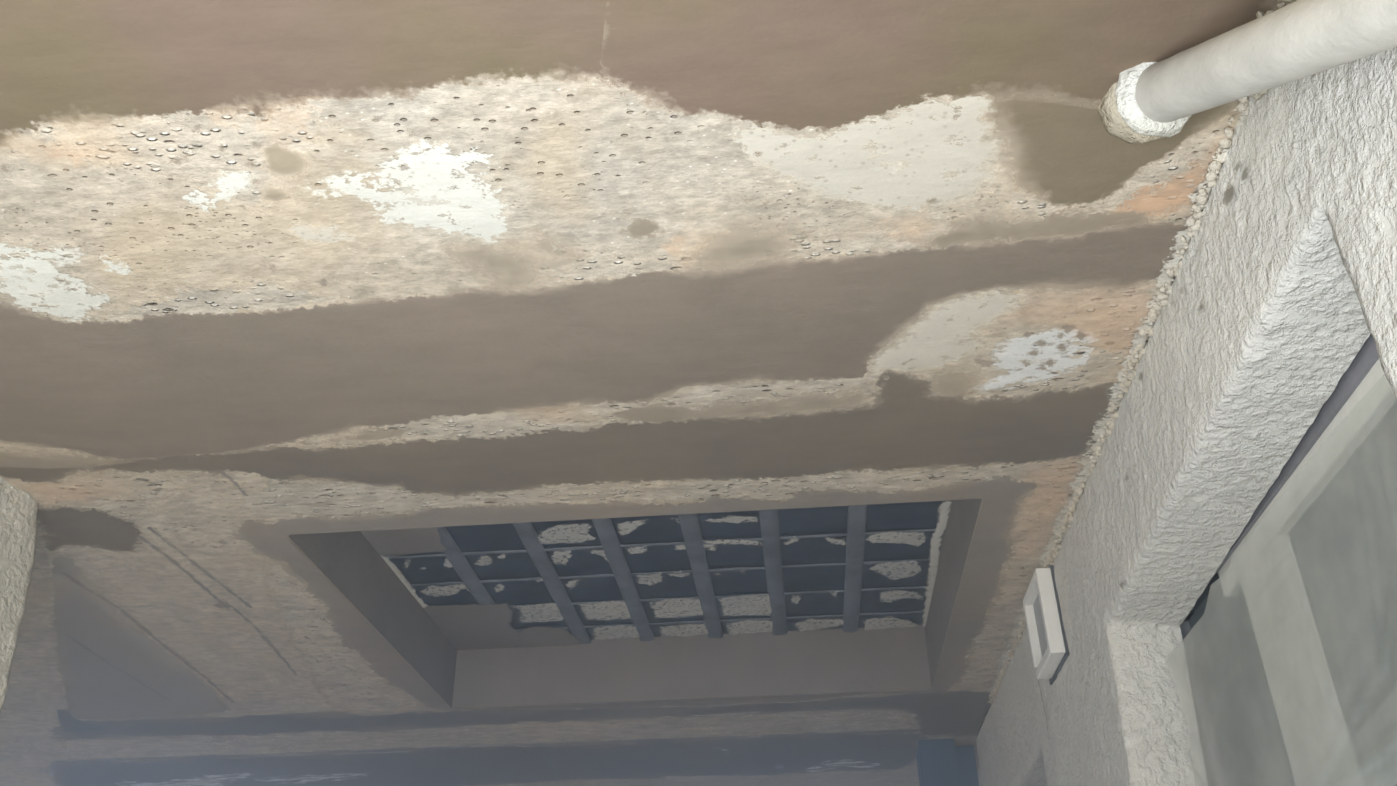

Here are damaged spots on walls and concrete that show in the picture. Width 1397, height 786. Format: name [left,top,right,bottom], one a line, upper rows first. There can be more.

spalling [31,103,512,246]
peeling [0,243,350,323]
spalling [242,94,1249,708]
crack [138,527,296,675]
peeling [115,773,367,786]
spalling [62,710,914,761]